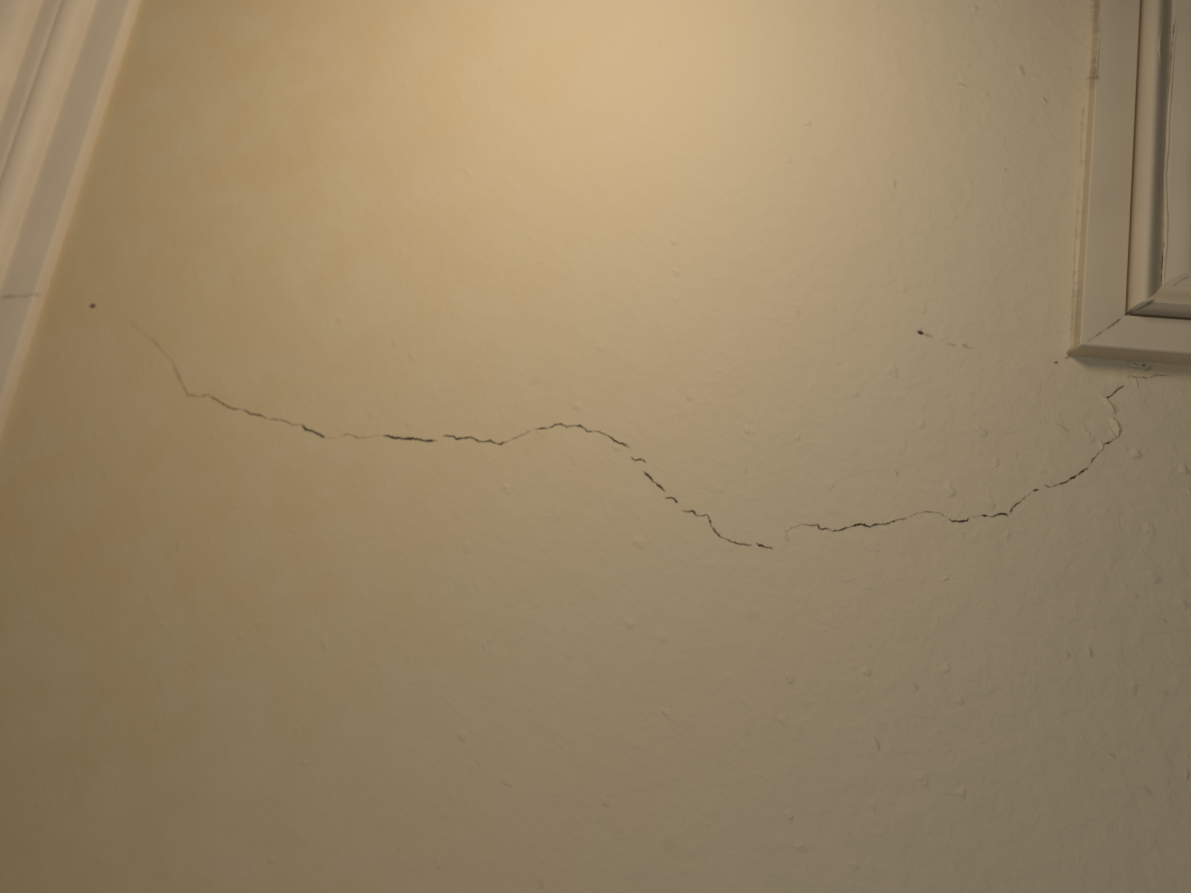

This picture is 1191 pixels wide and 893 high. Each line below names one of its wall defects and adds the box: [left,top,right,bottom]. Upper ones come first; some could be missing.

crack [385,435,502,445]
crack [541,423,790,548]
crack [818,520,895,531]
crack [951,377,1139,522]